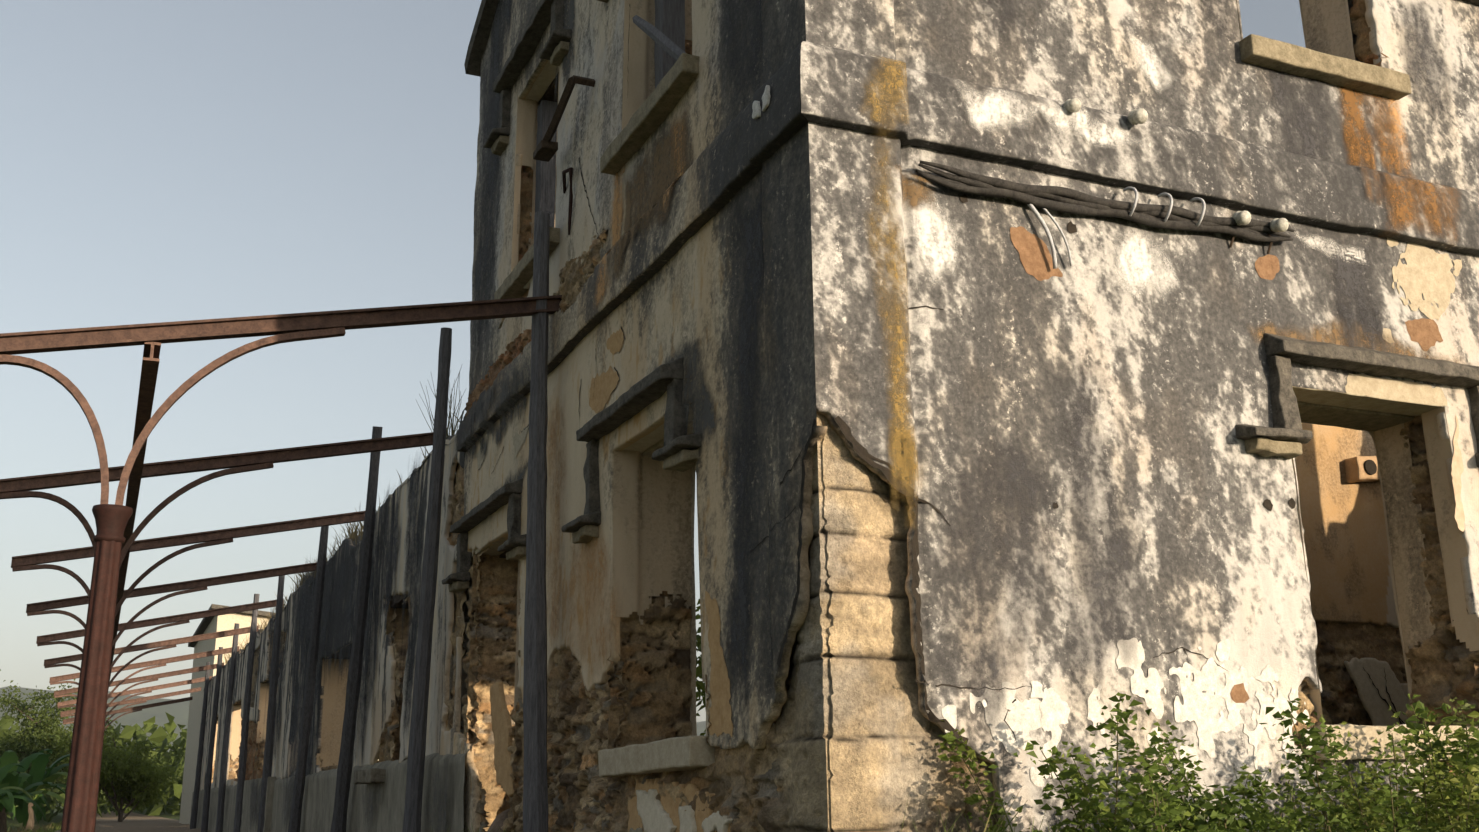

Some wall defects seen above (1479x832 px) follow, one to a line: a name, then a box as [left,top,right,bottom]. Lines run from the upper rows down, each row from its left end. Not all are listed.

flaking render [1349,0,1388,66]
water stain [1270,69,1328,158]
water stain [902,172,929,208]
spalling [1010,226,1063,281]
peeling [1382,238,1462,351]
spalling [464,325,532,417]
water stain [730,201,790,680]
water stain [269,462,421,822]
flaking render [444,547,524,832]
spalling [547,413,1070,832]
peeling [1087,684,1105,736]
flaking render [1116,416,1479,773]